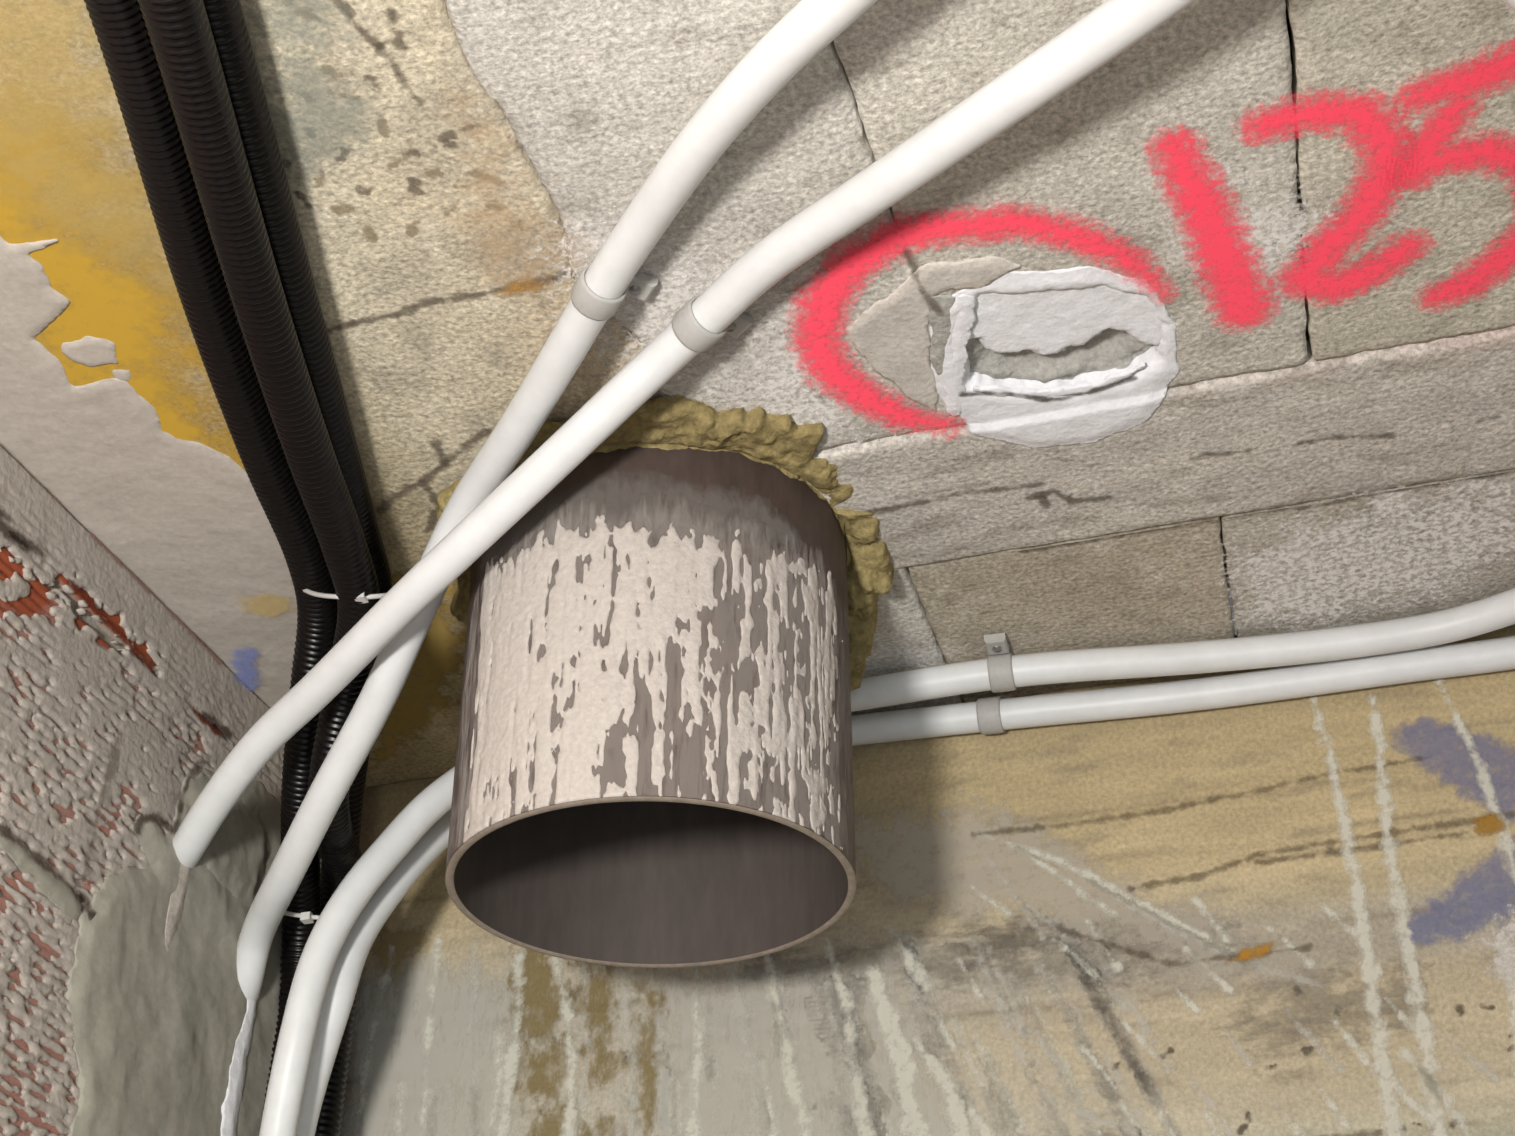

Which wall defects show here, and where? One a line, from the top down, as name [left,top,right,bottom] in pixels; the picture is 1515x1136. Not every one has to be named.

crack [334,0,416,98]
spalling [364,226,377,242]
crack [327,273,573,332]
spalling [845,256,1021,411]
peeling [0,236,298,1136]
leakage [373,583,466,760]
leakage [489,952,525,1136]
leakage [550,957,578,1136]
leakage [664,1002,702,1136]
leakage [764,954,811,1136]
leakage [827,939,1026,1136]